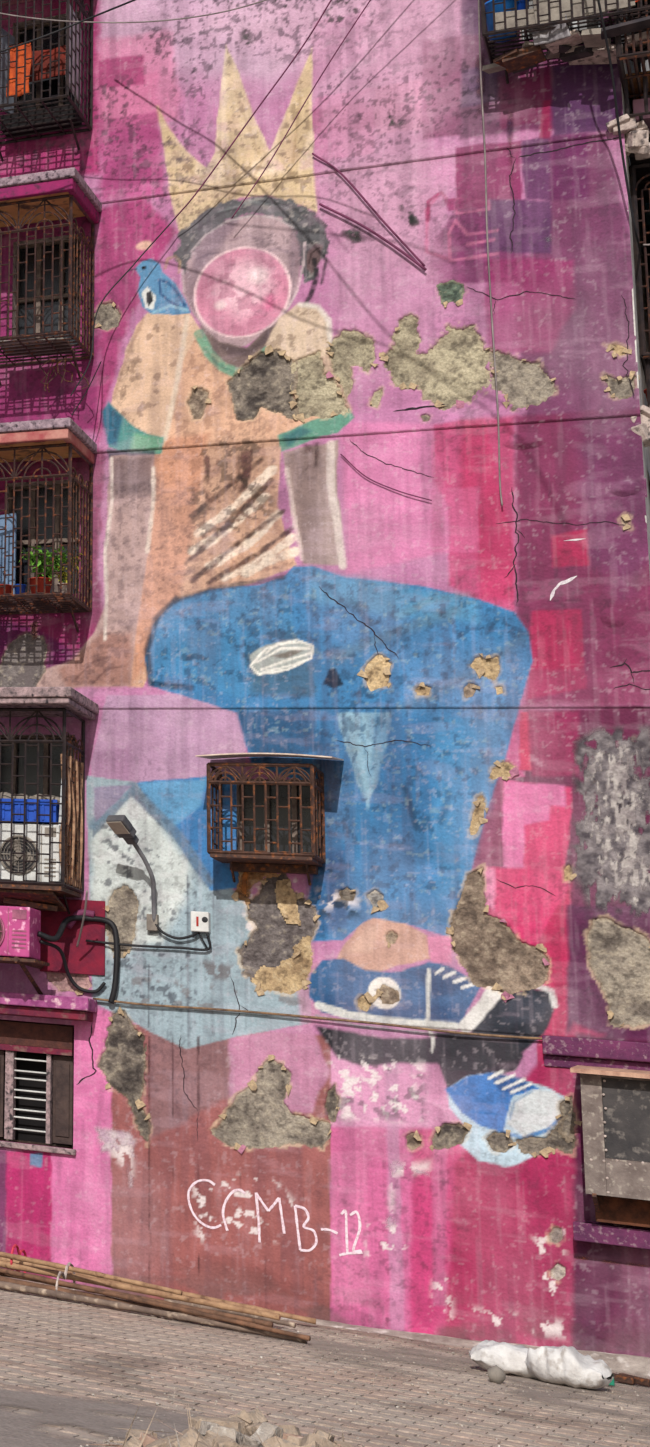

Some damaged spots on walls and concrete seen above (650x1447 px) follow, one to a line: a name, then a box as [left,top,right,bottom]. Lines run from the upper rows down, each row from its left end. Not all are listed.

flaking render [187,386,211,419]
flaking render [227,315,557,423]
crack [496,489,619,602]
flaking render [357,655,391,691]
flaking render [464,653,503,698]
flaking render [231,872,321,996]
flaking render [446,867,550,1003]
flaking render [587,918,650,1027]
flaking render [98,1006,151,1142]
flaking render [211,1055,340,1154]
flaking render [406,1122,472,1151]
flaking render [486,1096,582,1158]